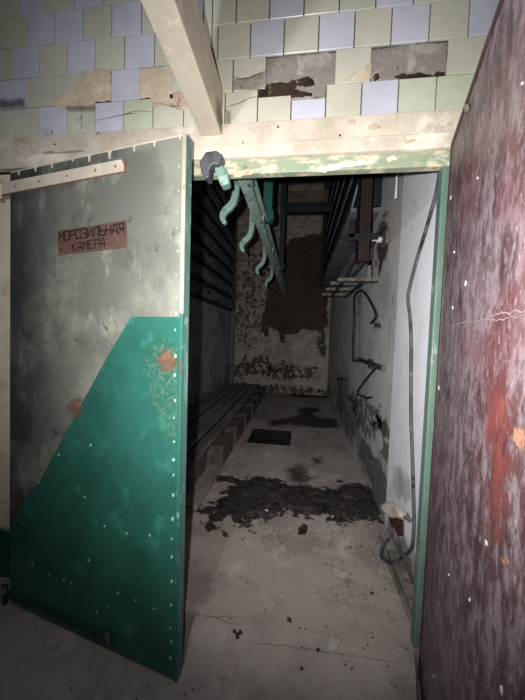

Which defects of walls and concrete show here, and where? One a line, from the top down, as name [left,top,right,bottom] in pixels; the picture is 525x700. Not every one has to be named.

spalling [52,68,112,108]
spalling [138,65,189,110]
spalling [233,42,447,101]
peeling [232,168,254,178]
peeling [316,159,374,173]
flaking render [234,251,328,396]
crack [245,641,402,663]